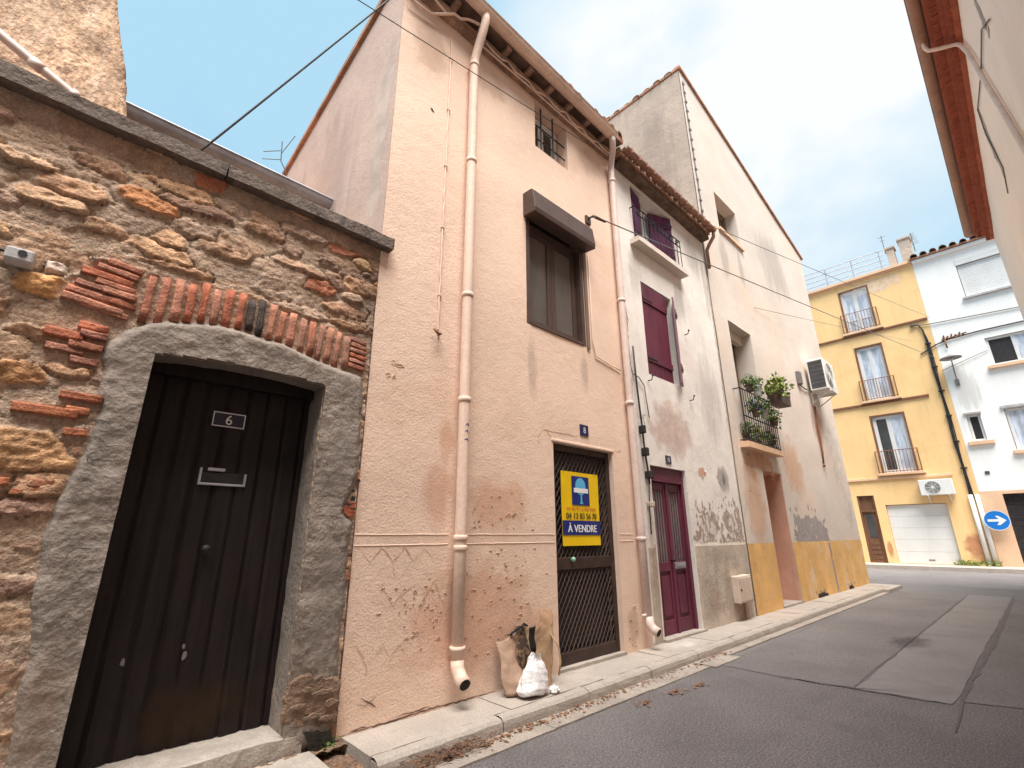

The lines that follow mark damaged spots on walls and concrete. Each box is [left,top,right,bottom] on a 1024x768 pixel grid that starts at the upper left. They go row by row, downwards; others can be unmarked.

peeling [693,496,745,544]
peeling [789,506,862,598]